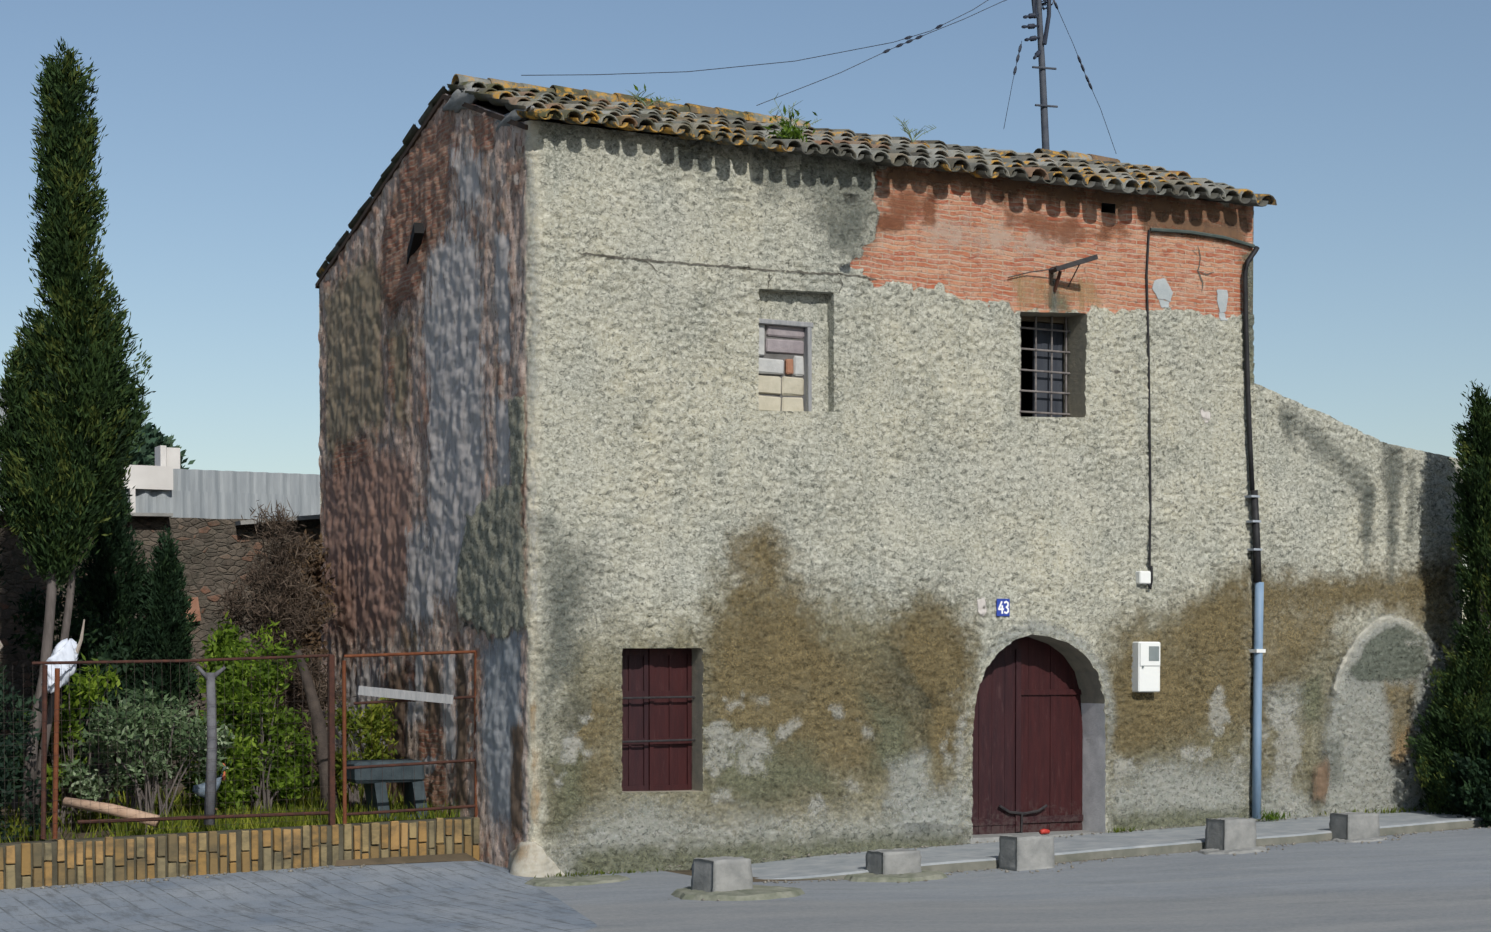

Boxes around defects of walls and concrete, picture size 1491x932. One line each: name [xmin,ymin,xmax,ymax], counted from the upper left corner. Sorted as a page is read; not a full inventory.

spalling [850,166,1253,320]
peeling [322,111,525,807]
water stain [1283,412,1413,553]
water stain [552,536,966,875]
water stain [1114,557,1458,832]